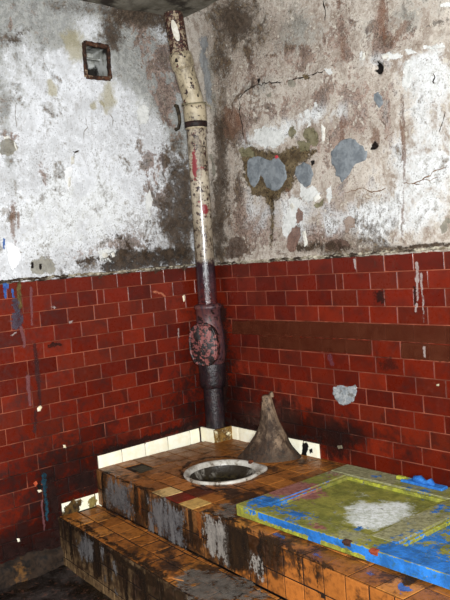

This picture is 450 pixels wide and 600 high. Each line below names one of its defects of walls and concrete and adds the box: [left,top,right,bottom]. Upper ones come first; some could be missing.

crack [227,71,323,139]
leakage [76,157,195,279]
leakage [209,116,230,258]
leakage [242,126,332,246]
leakage [101,473,135,518]
leakage [144,489,193,549]